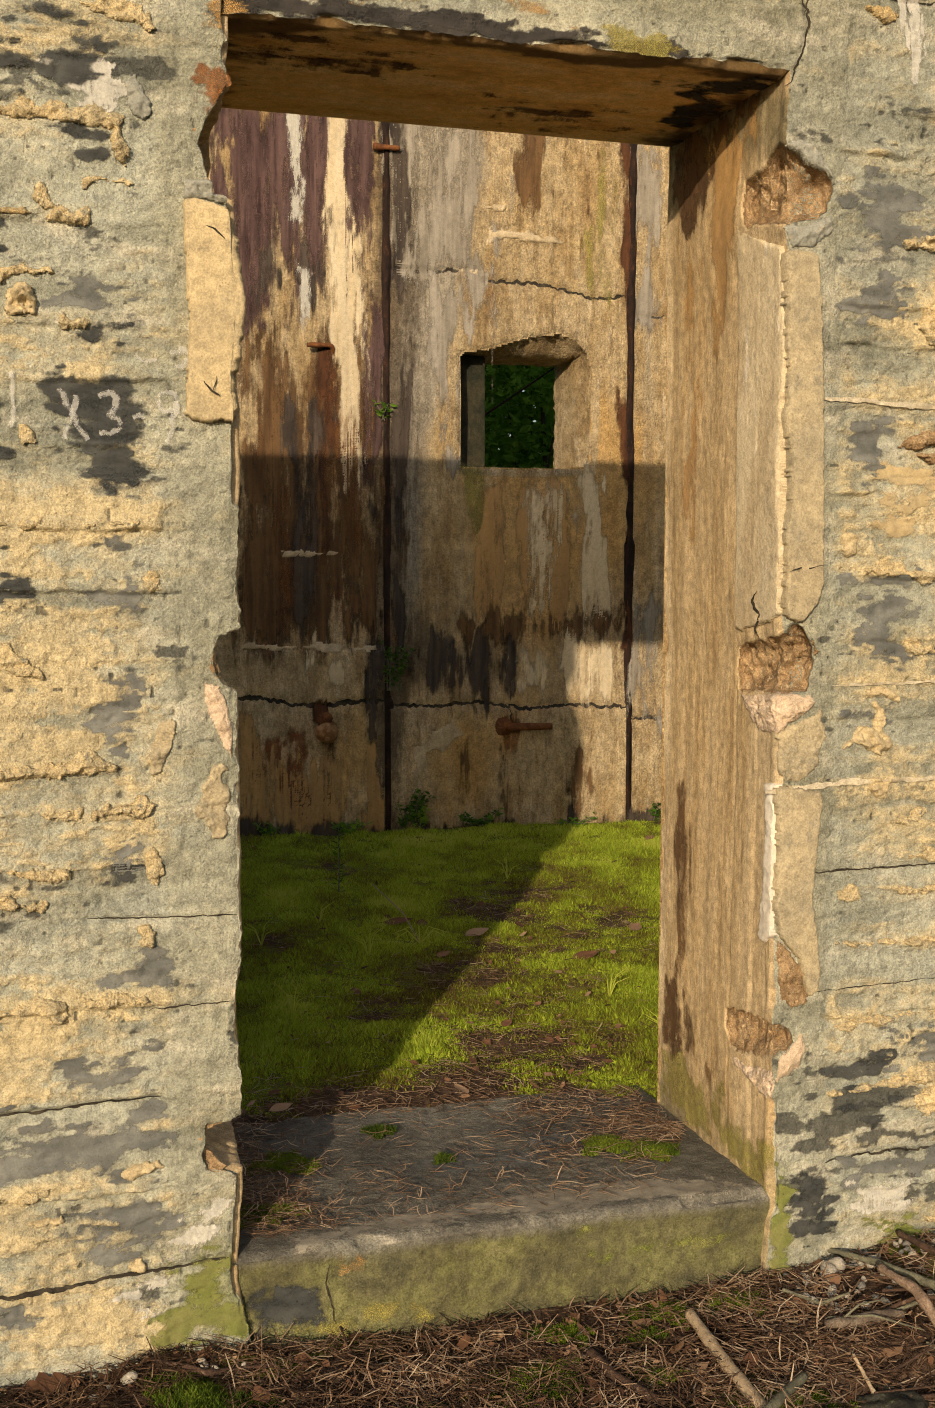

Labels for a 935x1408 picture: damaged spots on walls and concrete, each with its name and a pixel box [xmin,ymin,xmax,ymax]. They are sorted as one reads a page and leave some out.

damp [678,77,768,96]
crack [785,0,811,86]
damp [635,134,698,332]
spalling [743,139,835,248]
crack [395,266,664,320]
damp [210,108,662,790]
crack [238,694,657,722]
spalling [738,624,826,781]
corrosion [238,699,385,834]
damp [566,736,594,823]
flaking render [775,941,808,1008]
spalling [726,1007,805,1098]